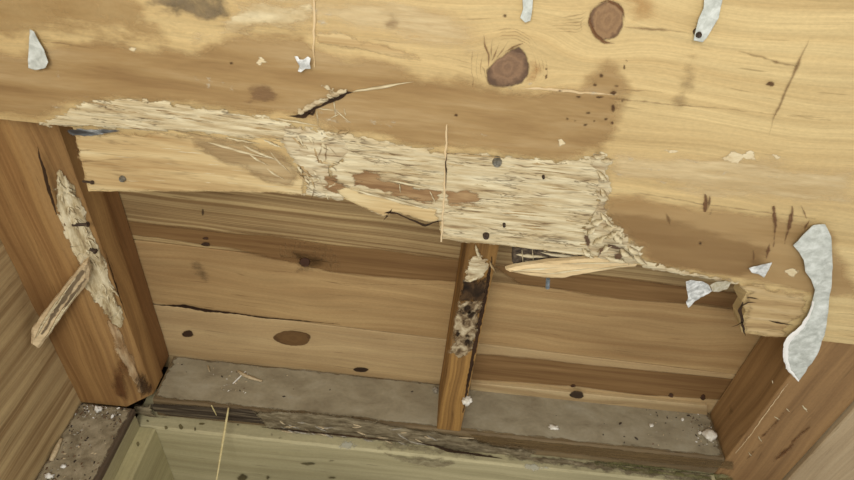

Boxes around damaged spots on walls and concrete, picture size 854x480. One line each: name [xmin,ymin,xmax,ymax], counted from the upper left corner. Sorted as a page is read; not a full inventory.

water stain [0,37,626,160]
crack [291,91,352,118]
crack [38,149,57,215]
peeling [297,165,335,200]
crack [380,209,440,227]
peeling [584,213,647,267]
crack [153,304,340,325]
water stain [128,221,738,400]
crack [732,297,757,334]
water stain [115,362,126,398]